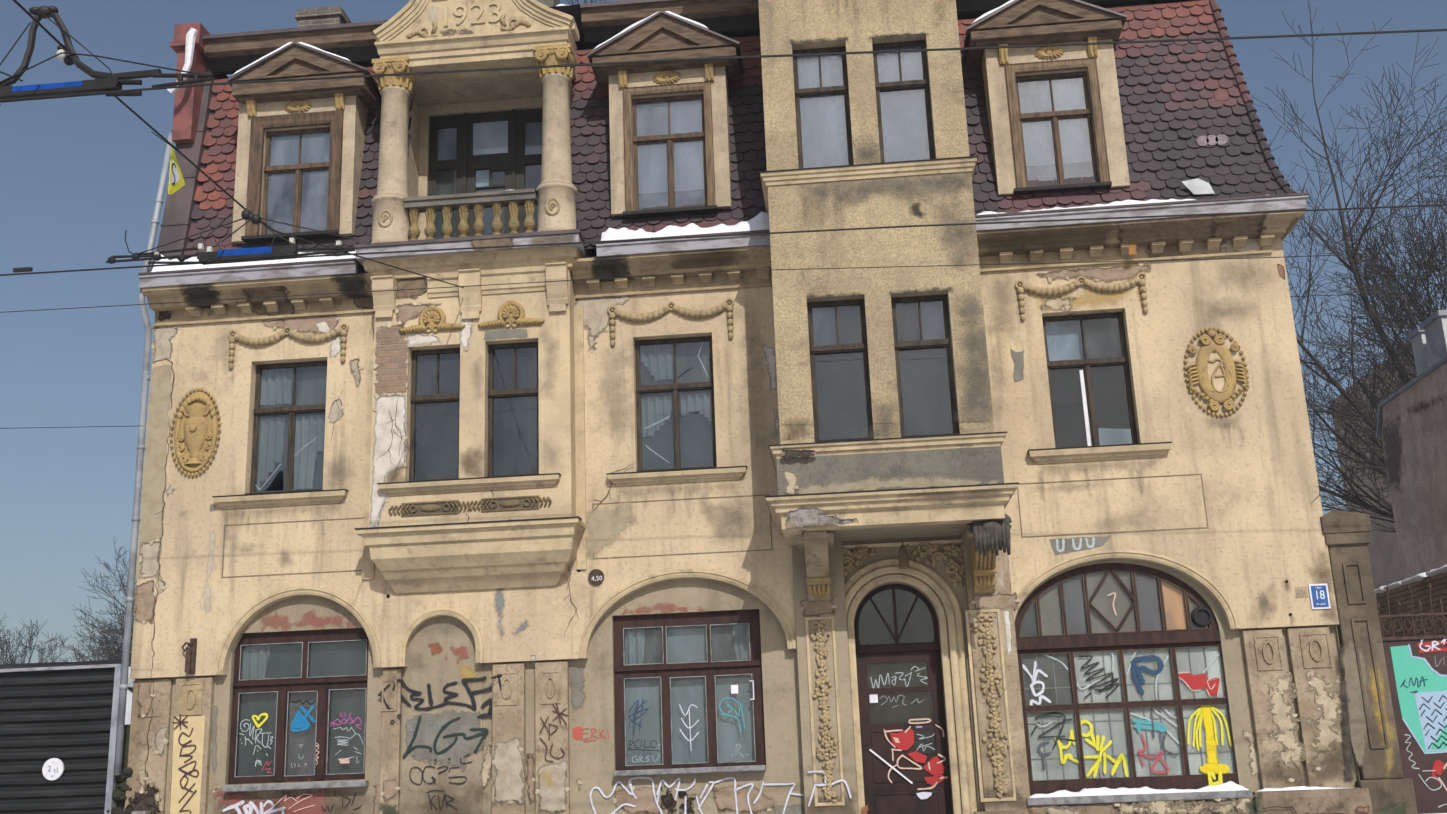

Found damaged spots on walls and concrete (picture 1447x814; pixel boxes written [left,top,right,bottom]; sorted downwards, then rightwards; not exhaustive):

water stain [817,173,967,216]
peeling [242,277,475,527]
peeling [574,296,631,353]
water stain [962,300,991,421]
flaking render [774,409,856,529]
flaking render [133,538,167,624]
peeling [479,737,582,814]